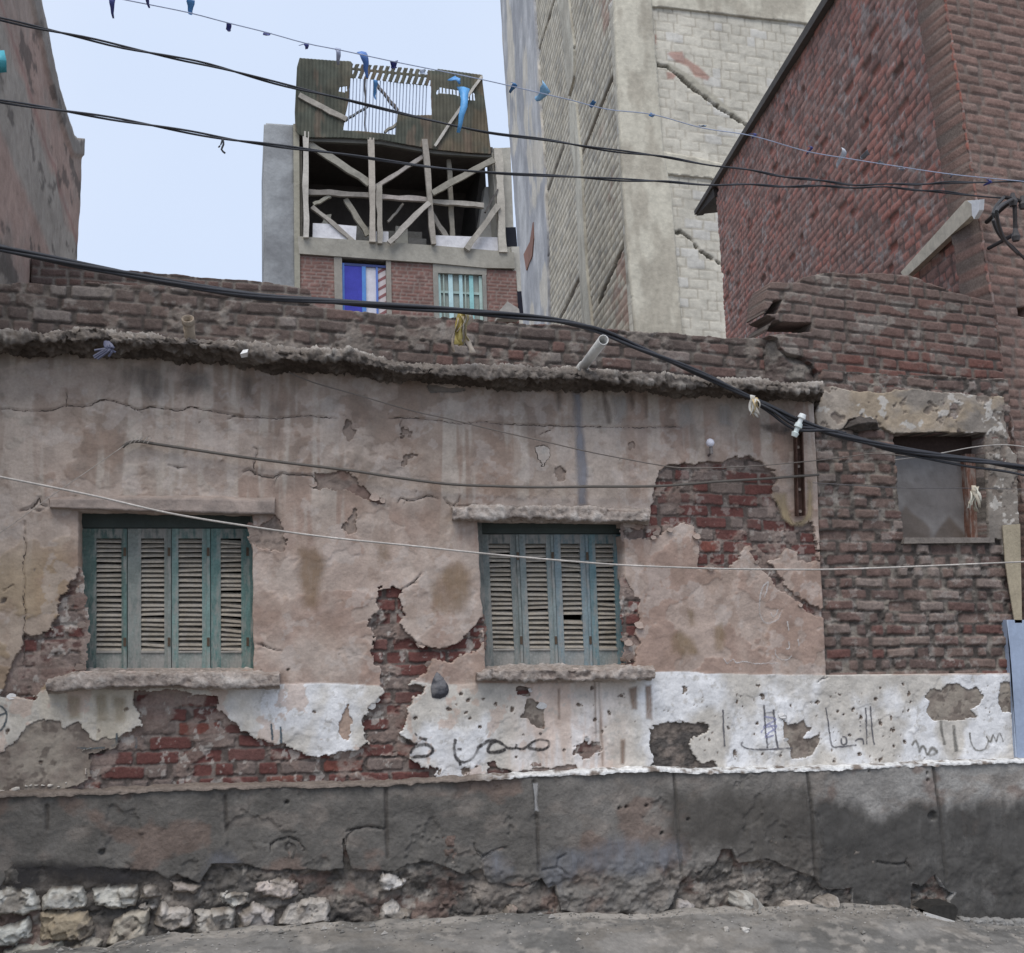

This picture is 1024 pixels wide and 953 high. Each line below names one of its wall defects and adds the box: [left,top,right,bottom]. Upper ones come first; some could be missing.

crack [1,394,331,420]
peeling [535,445,566,482]
flaking render [309,471,385,535]
flaking render [619,456,818,571]
crack [9,536,27,669]
flaking render [0,568,487,791]
peeling [510,686,547,729]
peeling [925,683,984,721]
flaking render [461,711,611,775]
flaking render [649,720,716,769]